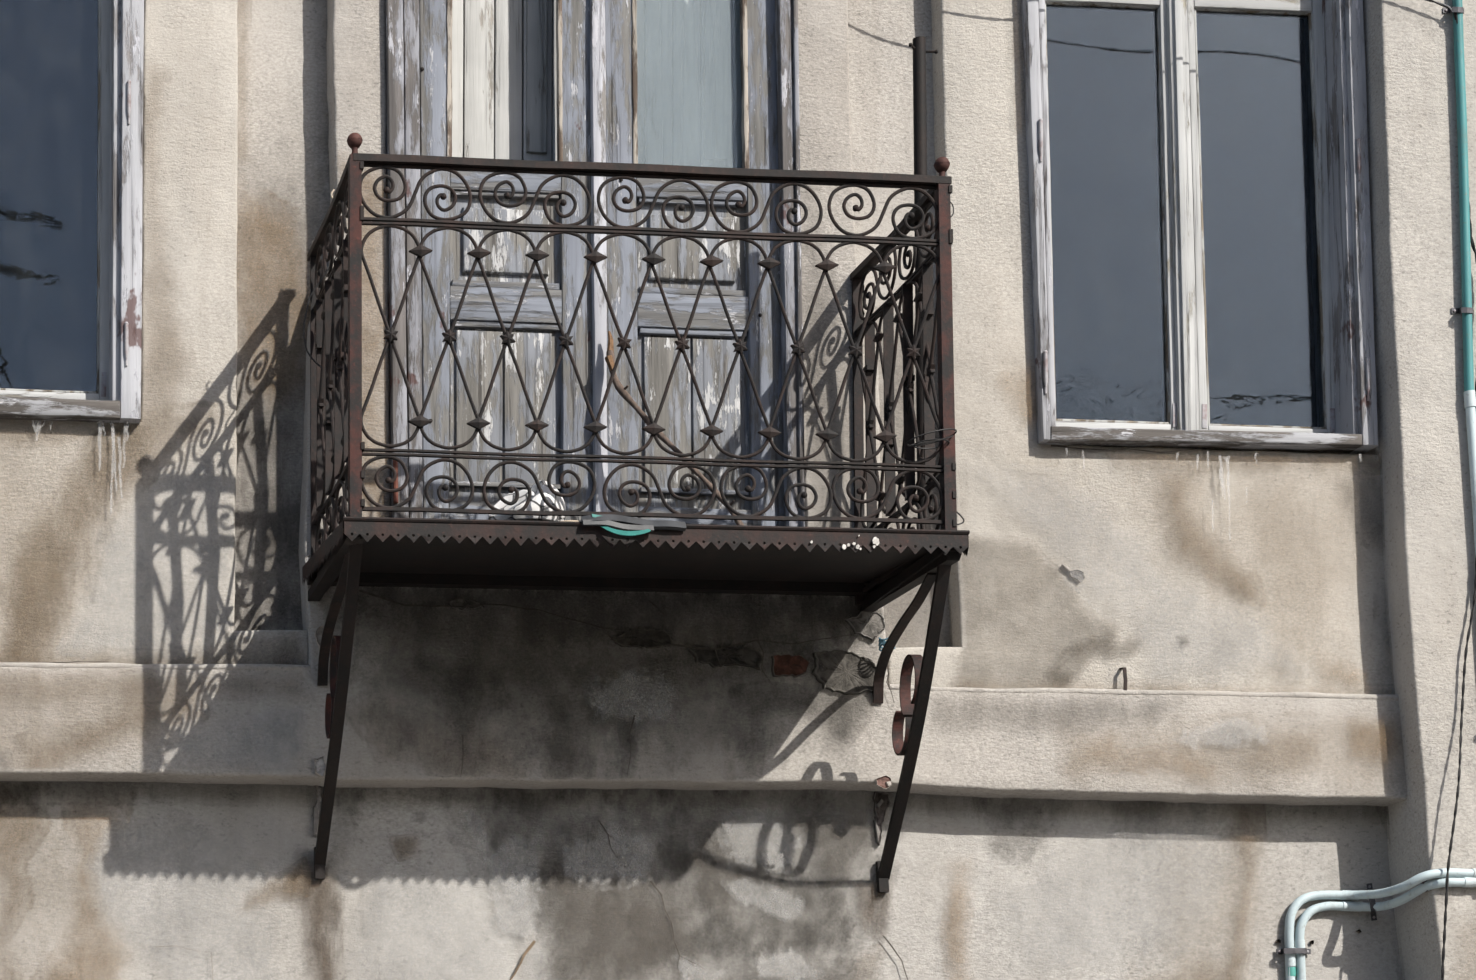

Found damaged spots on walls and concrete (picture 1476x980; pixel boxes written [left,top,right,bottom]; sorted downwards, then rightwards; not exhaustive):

damp [73,421,148,534]
spalling [610,611,886,695]